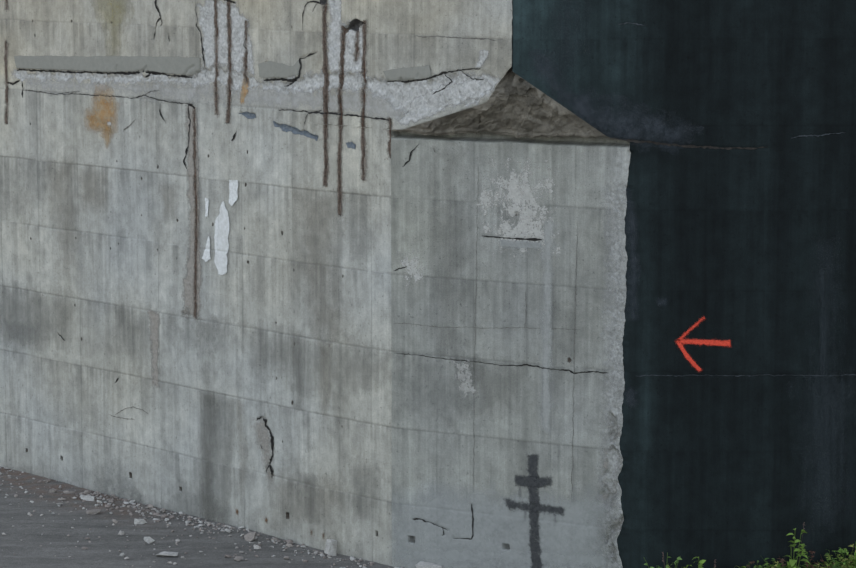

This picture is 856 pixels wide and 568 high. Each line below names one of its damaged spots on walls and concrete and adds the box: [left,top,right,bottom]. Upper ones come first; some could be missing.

crack [17,3,206,171]
spalling [181,104,247,320]
spalling [4,0,499,215]
crack [257,417,274,475]
crack [413,421,475,540]
crack [393,172,607,502]
spalling [595,191,626,568]